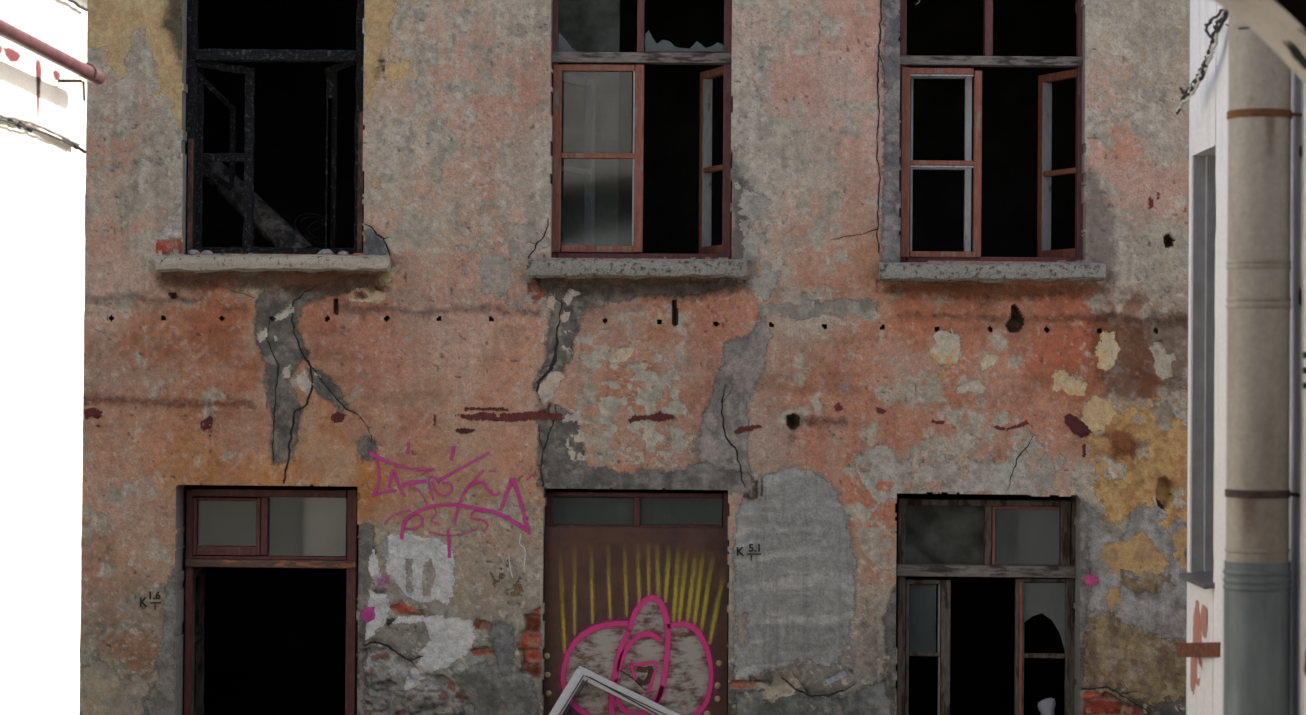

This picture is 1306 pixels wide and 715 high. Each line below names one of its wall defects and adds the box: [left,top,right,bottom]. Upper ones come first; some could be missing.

peeling [87,0,184,133]
crack [524,218,549,259]
spalling [1163,234,1175,248]
crack [213,284,372,484]
crack [536,290,569,486]
peeling [453,206,698,469]
crack [721,383,745,486]
peeling [929,328,999,395]
peeling [1094,330,1121,372]
peeling [853,342,1207,715]
flaking render [390,601,425,616]
flaking render [490,560,542,678]